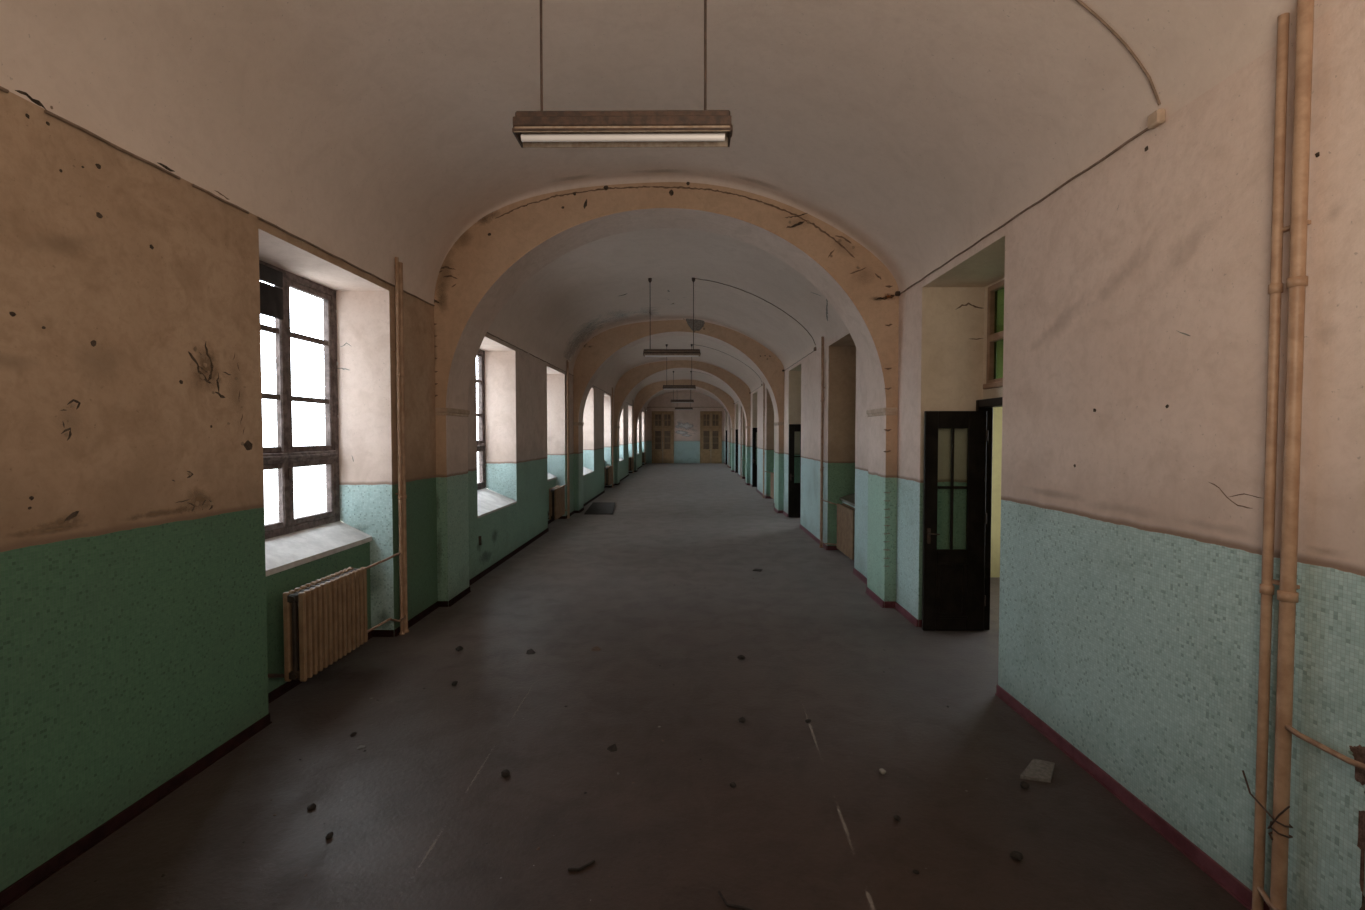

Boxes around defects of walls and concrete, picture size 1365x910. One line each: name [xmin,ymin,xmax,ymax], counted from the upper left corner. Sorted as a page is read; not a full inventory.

crack [1209,482,1261,509]
spalling [1348,745,1365,786]
spalling [1357,811,1365,910]